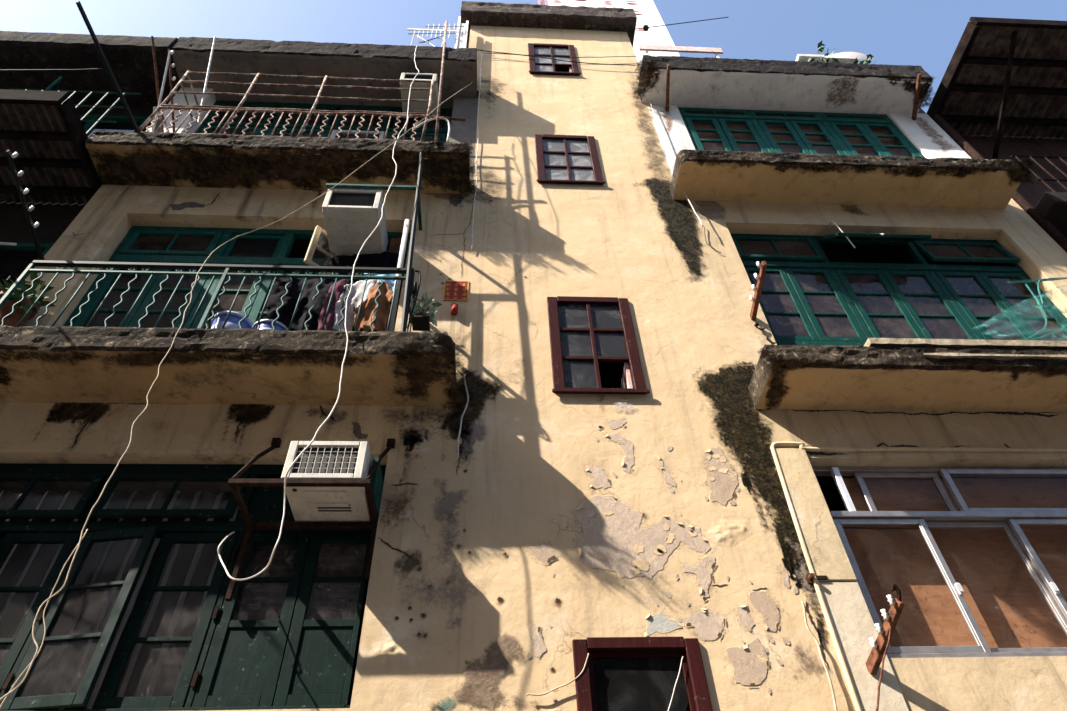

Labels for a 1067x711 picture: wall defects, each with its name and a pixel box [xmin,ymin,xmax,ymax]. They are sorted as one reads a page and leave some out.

damp [826,76,858,106]
damp [86,142,476,207]
damp [0,346,371,386]
damp [46,402,109,430]
damp [225,404,274,437]
damp [391,337,502,468]
crack [780,409,1066,417]
damp [400,428,421,482]
peeling [569,417,790,694]
damp [744,467,828,642]
peeling [782,571,798,594]
damp [437,634,538,711]